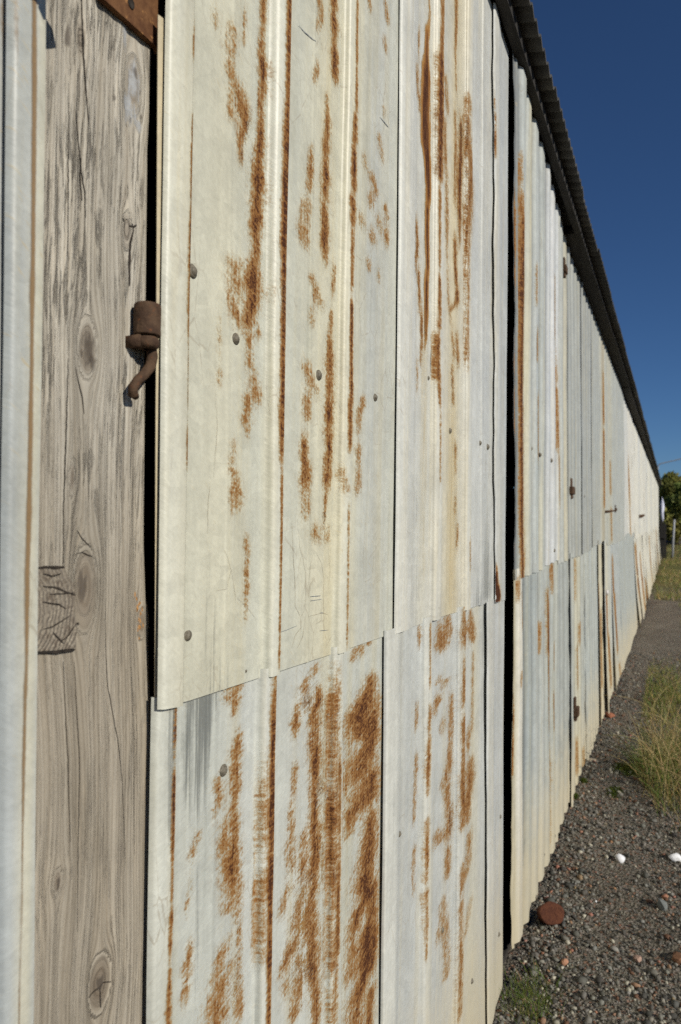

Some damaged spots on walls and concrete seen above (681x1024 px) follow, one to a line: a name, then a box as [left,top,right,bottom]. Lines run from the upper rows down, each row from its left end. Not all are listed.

corrosion [206,0,390,1024]
corrosion [411,606,476,1023]
corrosion [415,0,474,481]
corrosion [512,672,523,775]
corrosion [514,154,538,628]